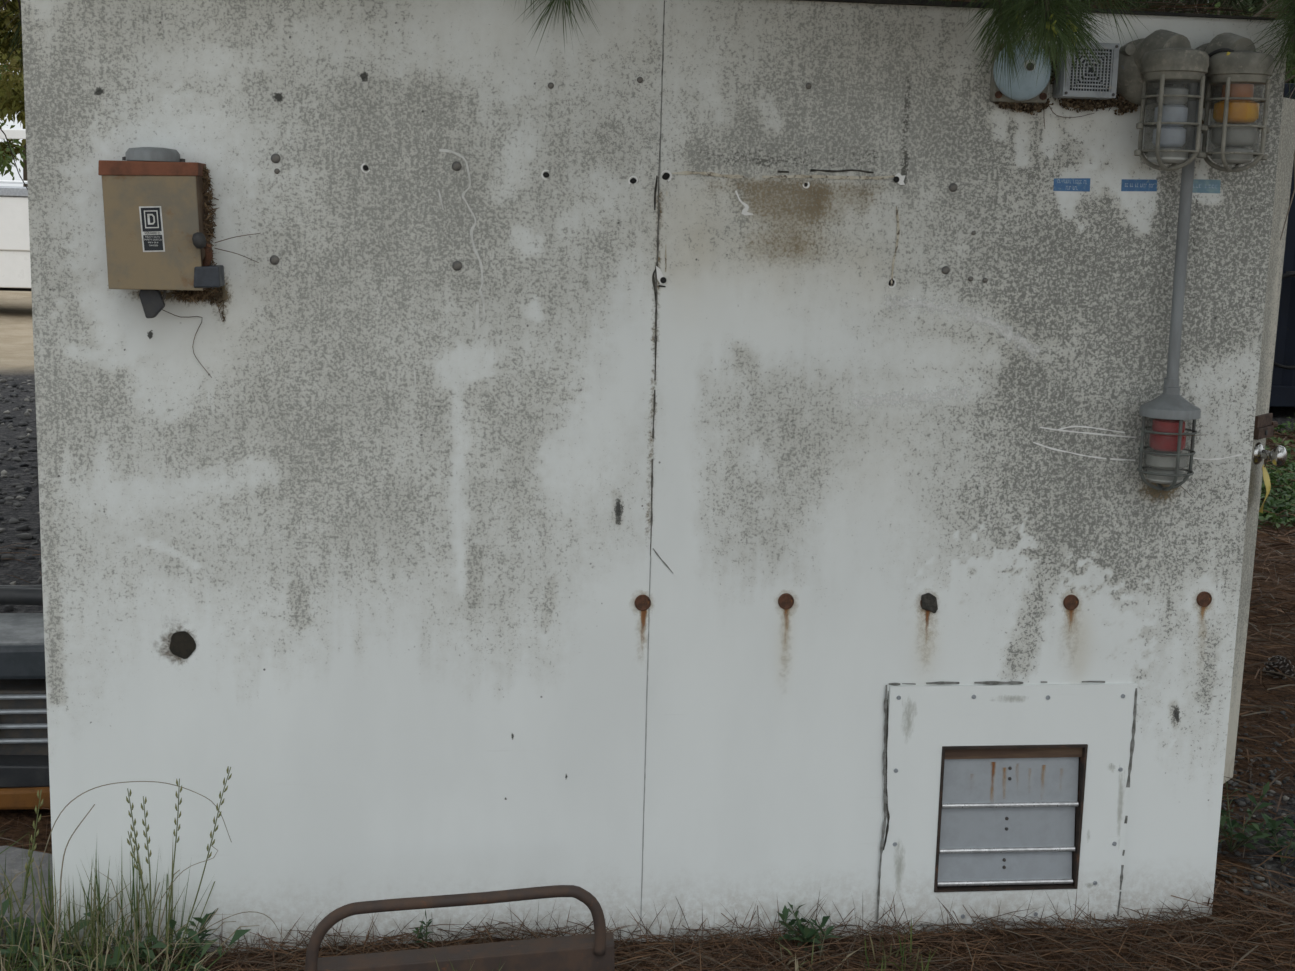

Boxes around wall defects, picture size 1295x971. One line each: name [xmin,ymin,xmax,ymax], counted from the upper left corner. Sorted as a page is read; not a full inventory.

damp [901,77,911,183]
damp [700,147,873,257]